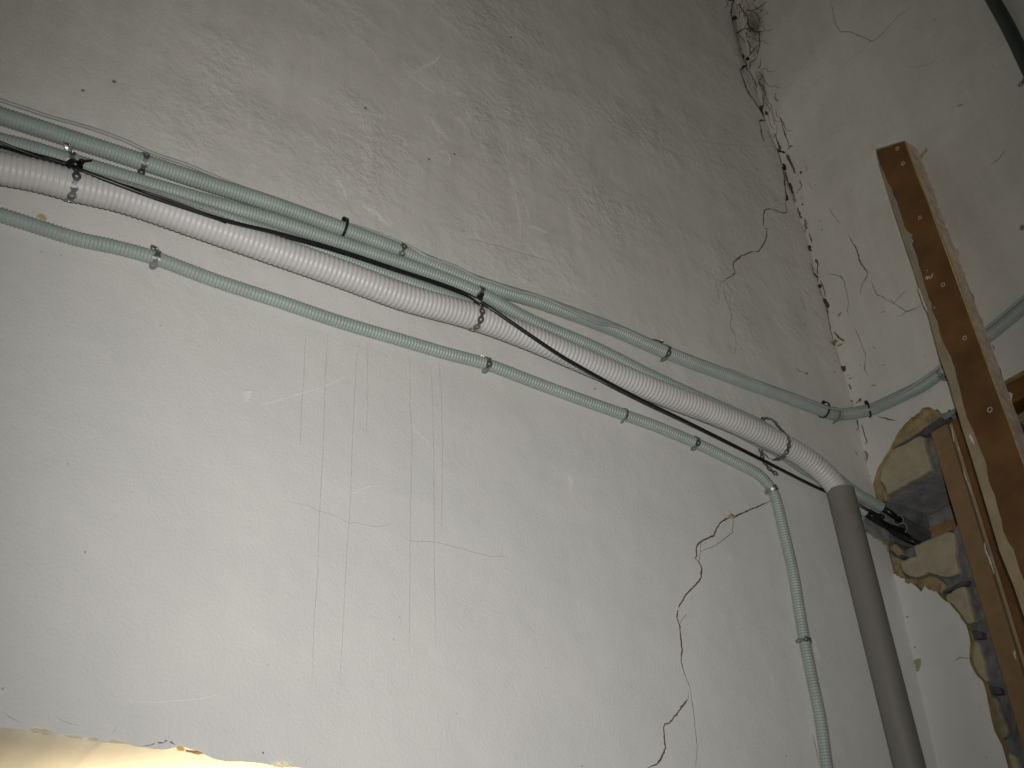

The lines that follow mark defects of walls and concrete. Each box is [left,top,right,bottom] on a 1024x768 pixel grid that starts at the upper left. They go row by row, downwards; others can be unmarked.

crack [716,0,920,460]
spalling [145,740,202,755]
crack [648,501,770,768]
spalling [863,408,1024,768]